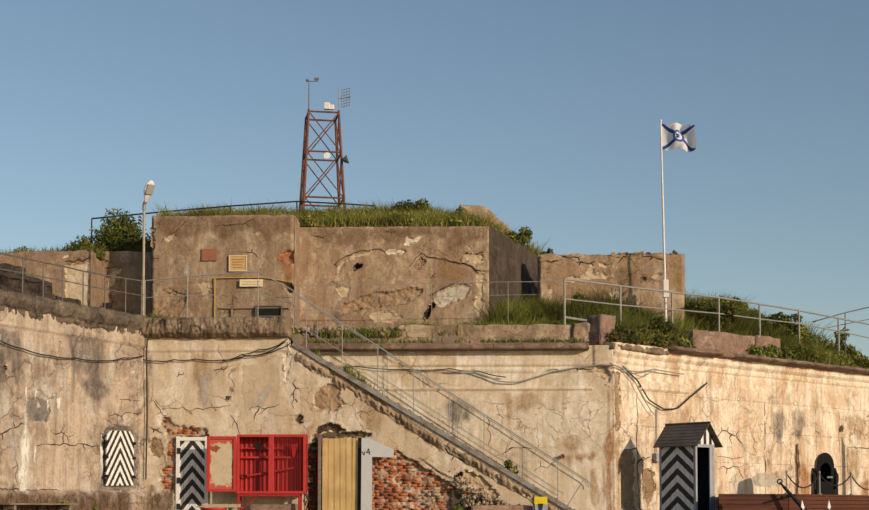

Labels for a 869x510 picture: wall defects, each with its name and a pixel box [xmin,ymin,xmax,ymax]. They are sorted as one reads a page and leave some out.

spalling [276,250,294,265]
spalling [335,250,423,323]
crack [333,247,489,323]
spalling [424,250,487,319]
spalling [565,252,653,283]
crack [110,366,373,442]
spalling [314,368,446,452]
flaking render [101,415,211,492]
flaking render [303,422,374,510]
flaking render [372,448,502,510]
crack [718,405,766,493]